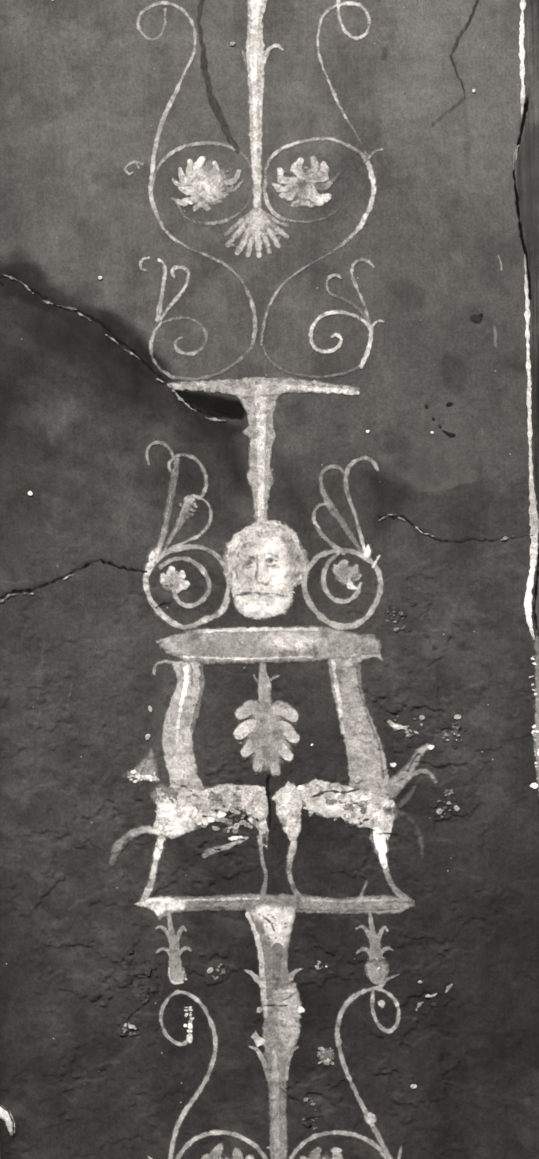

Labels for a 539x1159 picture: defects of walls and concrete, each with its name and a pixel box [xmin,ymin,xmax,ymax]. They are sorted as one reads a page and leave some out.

crack [197,0,240,152]
crack [432,0,478,125]
crack [0,274,241,422]
crack [0,559,147,603]
crack [378,514,539,636]